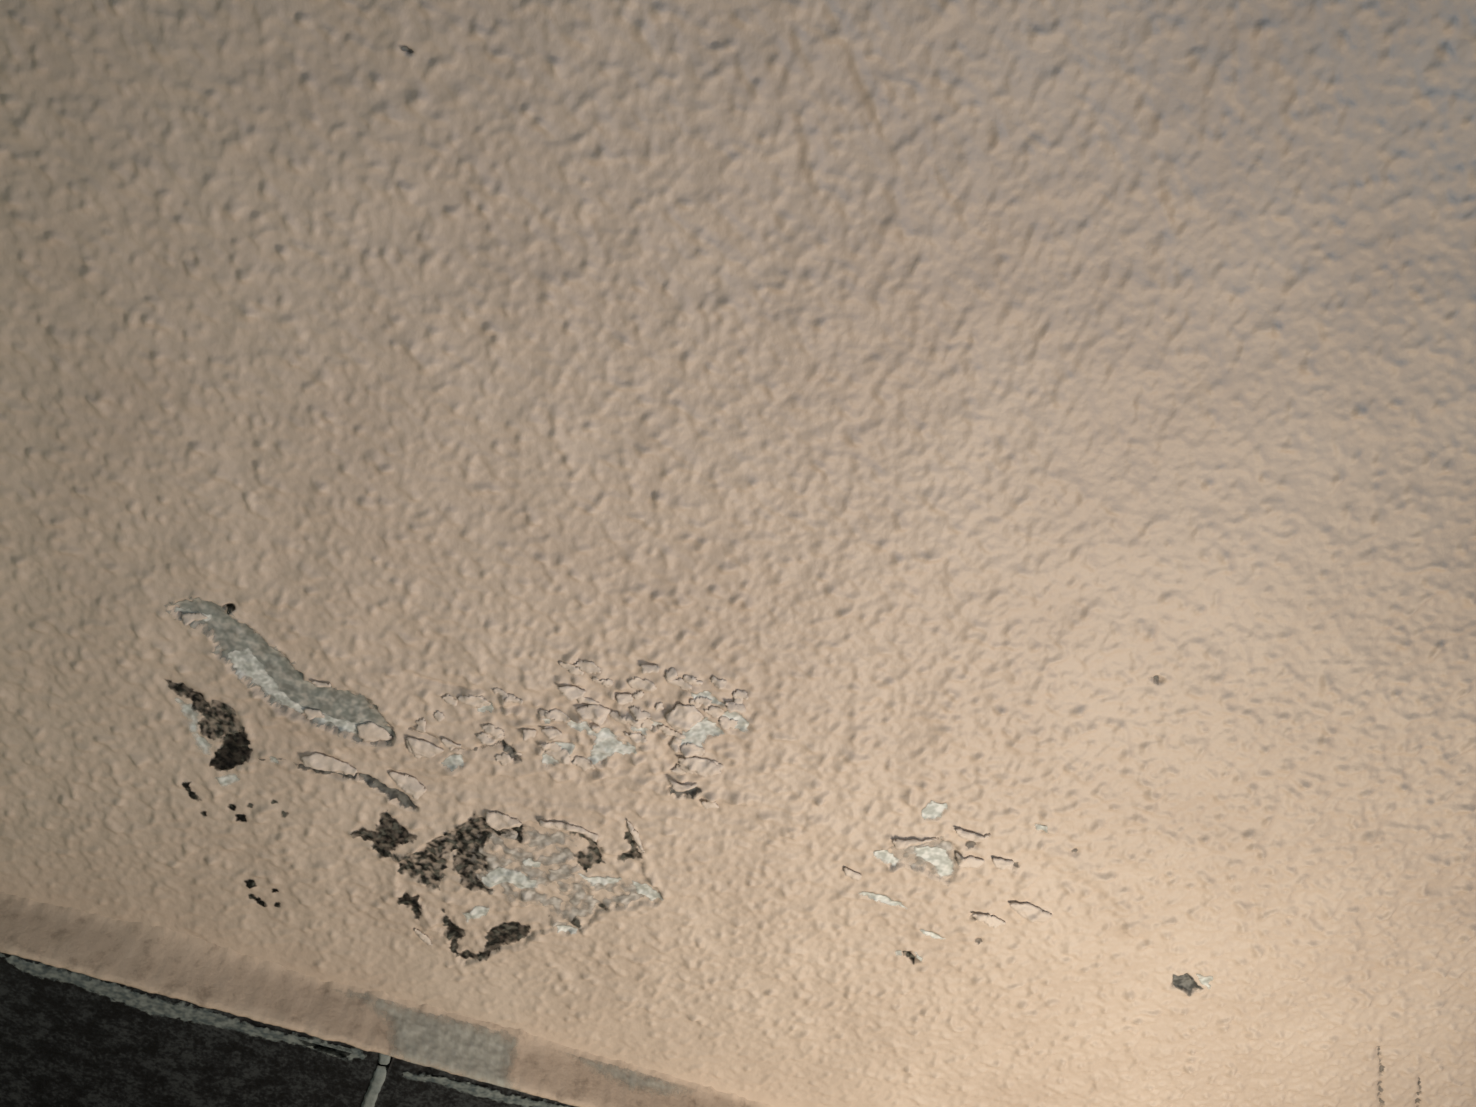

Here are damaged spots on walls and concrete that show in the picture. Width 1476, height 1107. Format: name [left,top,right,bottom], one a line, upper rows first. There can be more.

peeling [167,597,749,809]
peeling [922,801,948,820]
peeling [874,829,1018,876]
spalling [351,812,664,961]
peeling [844,867,907,909]
peeling [972,902,1053,943]